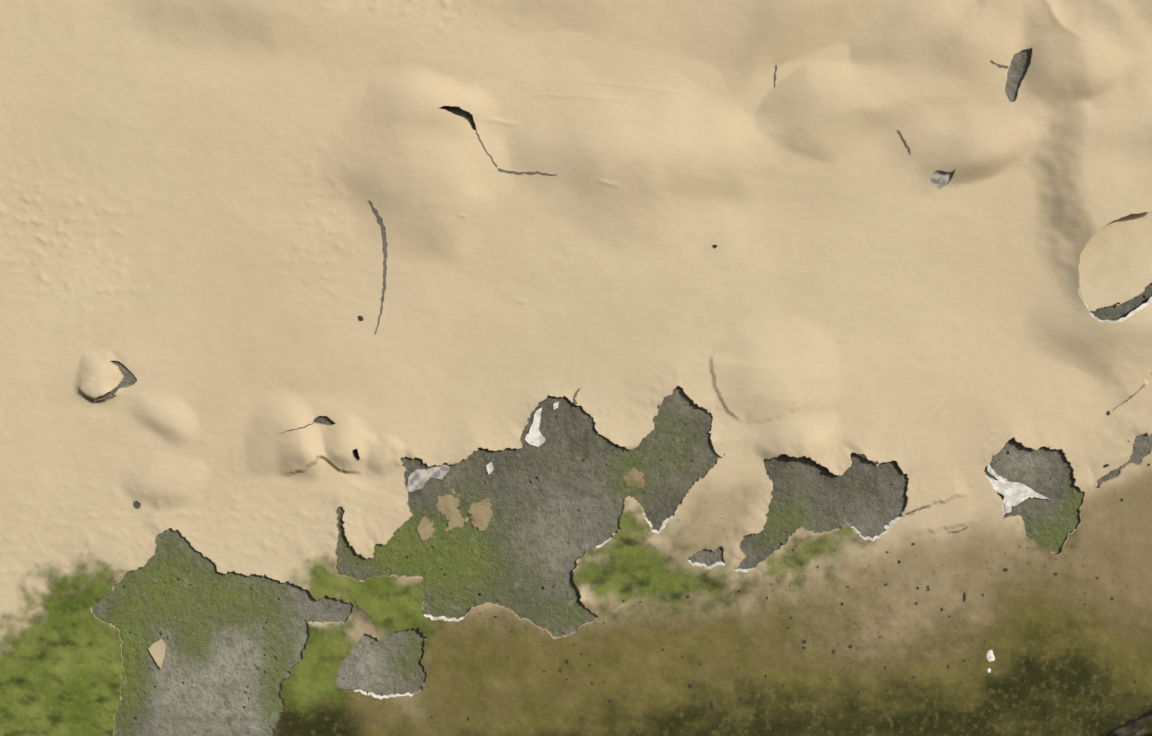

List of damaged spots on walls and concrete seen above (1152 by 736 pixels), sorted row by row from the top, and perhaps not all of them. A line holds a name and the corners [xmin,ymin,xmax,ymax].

peeling [1005,48,1032,102]
crack [476,132,557,176]
crack [368,201,388,334]
peeling [1090,283,1152,321]
peeling [96,361,137,399]
peeling [314,416,336,425]
peeling [336,386,725,638]
peeling [688,452,909,569]
peeling [984,433,1152,555]
peeling [92,528,353,736]
peeling [336,628,427,696]
crack [1101,709,1152,736]